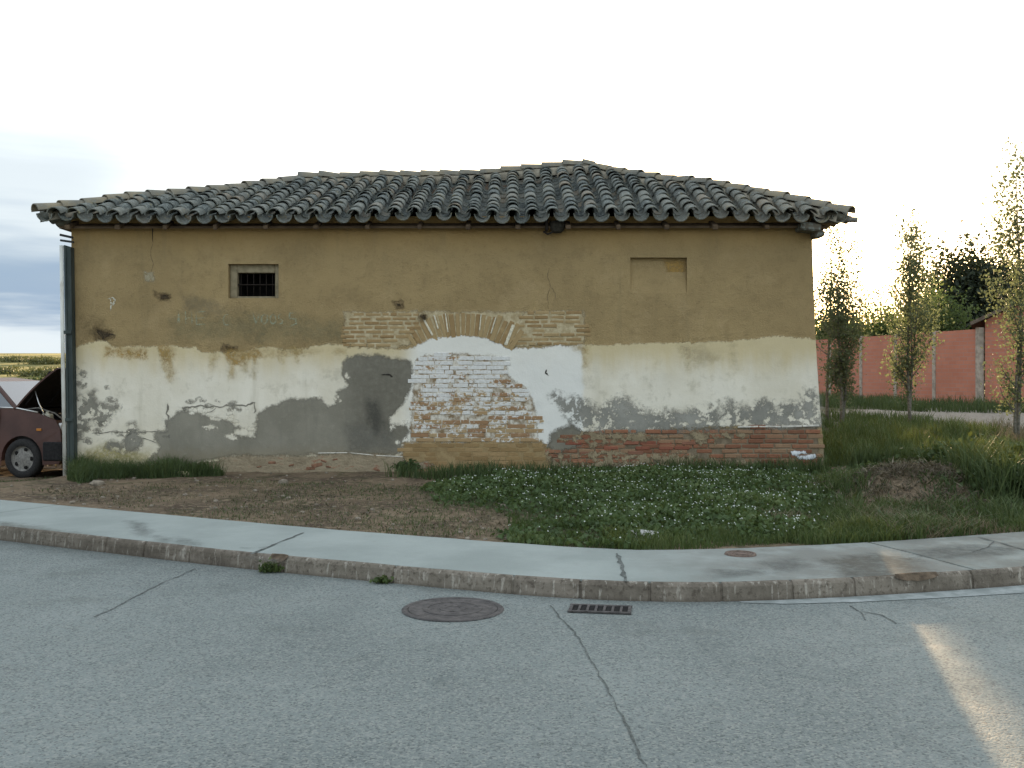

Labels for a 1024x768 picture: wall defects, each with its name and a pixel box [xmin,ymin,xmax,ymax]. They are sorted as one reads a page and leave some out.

peeling [76,328,821,473]